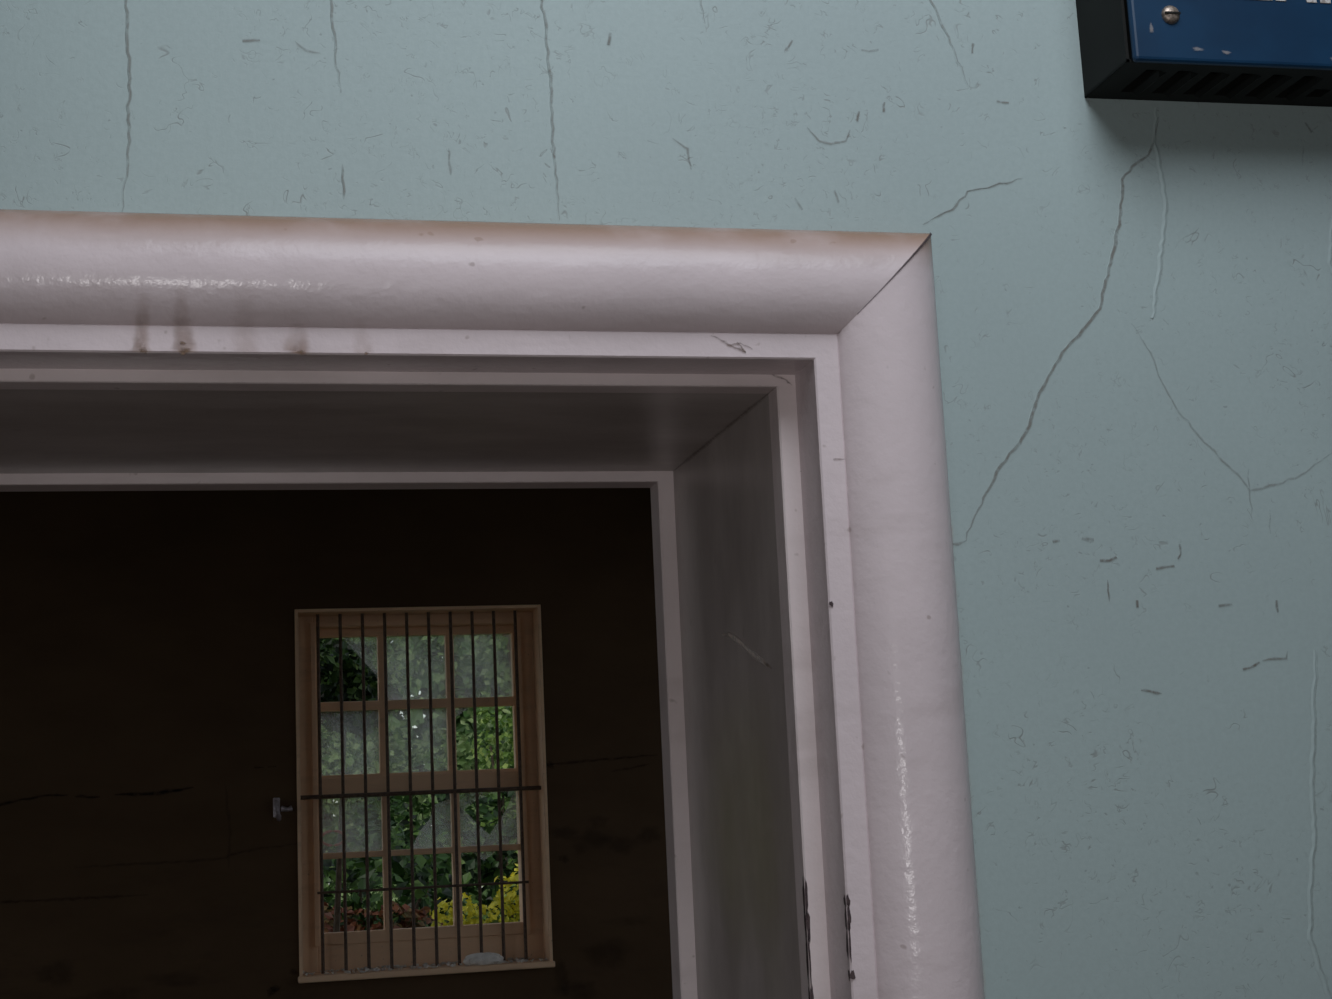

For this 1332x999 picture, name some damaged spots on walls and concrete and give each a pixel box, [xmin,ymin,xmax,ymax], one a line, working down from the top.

crack [121,0,129,199]
crack [540,2,558,216]
crack [857,179,1016,315]
crack [964,143,1152,539]